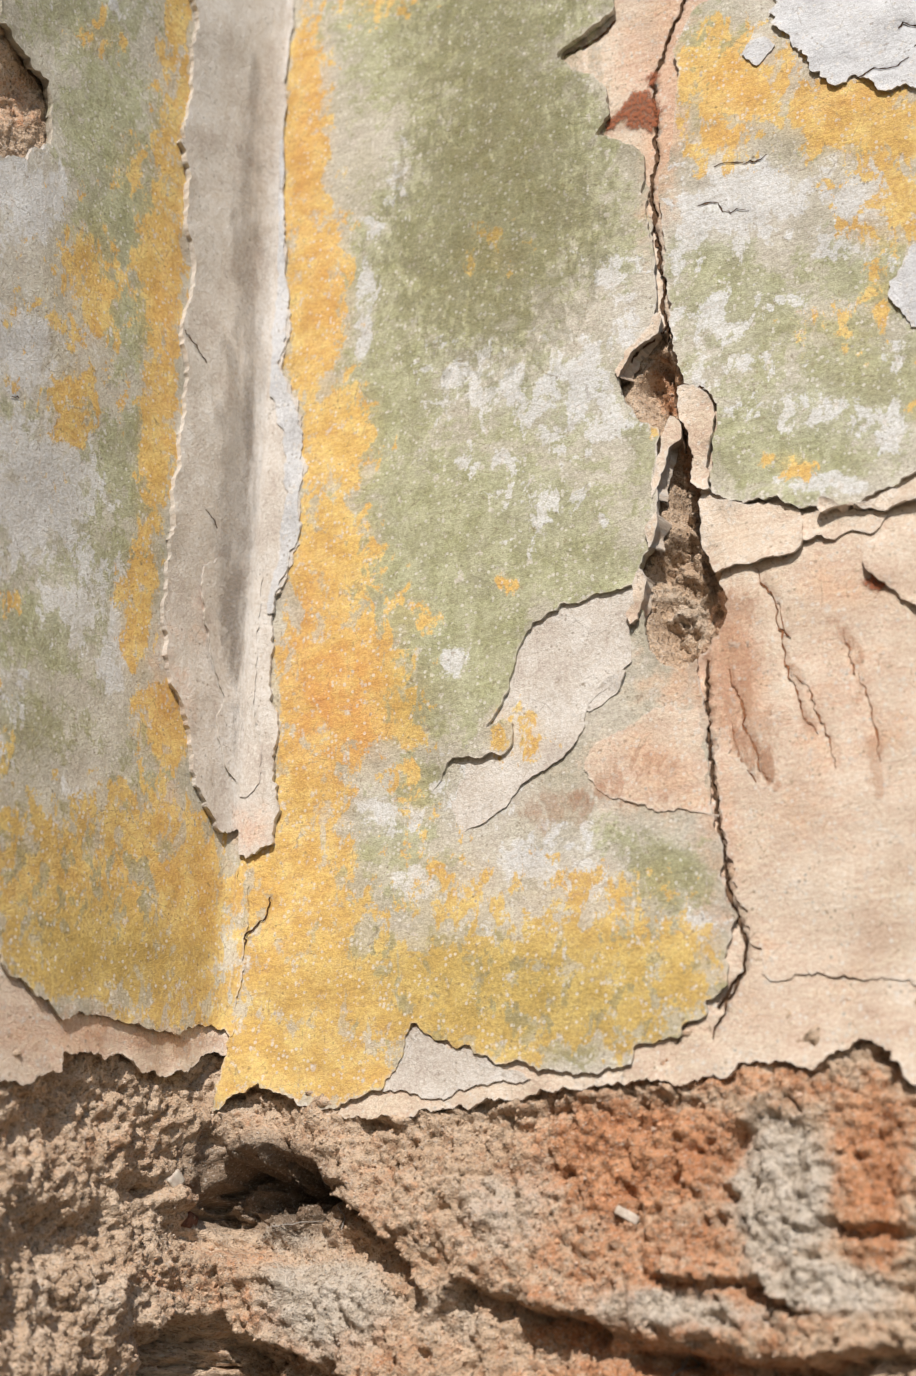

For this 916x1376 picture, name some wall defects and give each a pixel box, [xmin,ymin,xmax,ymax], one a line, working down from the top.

crack [631,0,686,364]
crack [698,202,750,213]
crack [714,154,767,167]
peeling [0,0,738,1115]
peeling [338,0,916,1317]
crack [674,383,704,454]
crack [675,659,771,1045]